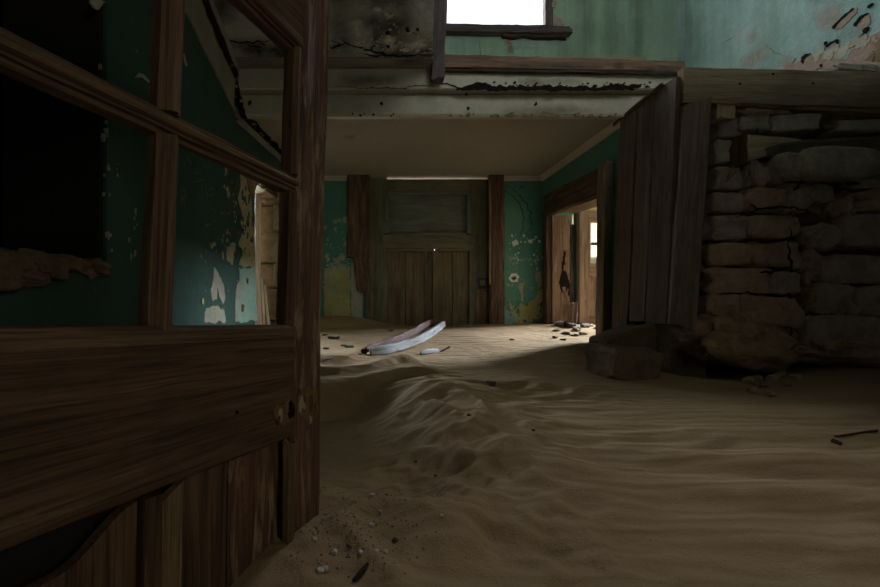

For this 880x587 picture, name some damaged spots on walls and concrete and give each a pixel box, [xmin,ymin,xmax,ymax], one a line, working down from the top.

crack [331,41,434,57]
spalling [456,81,651,92]
flaking render [784,3,880,72]
peeling [200,168,266,324]
peeling [323,216,351,316]
peeling [505,234,543,324]